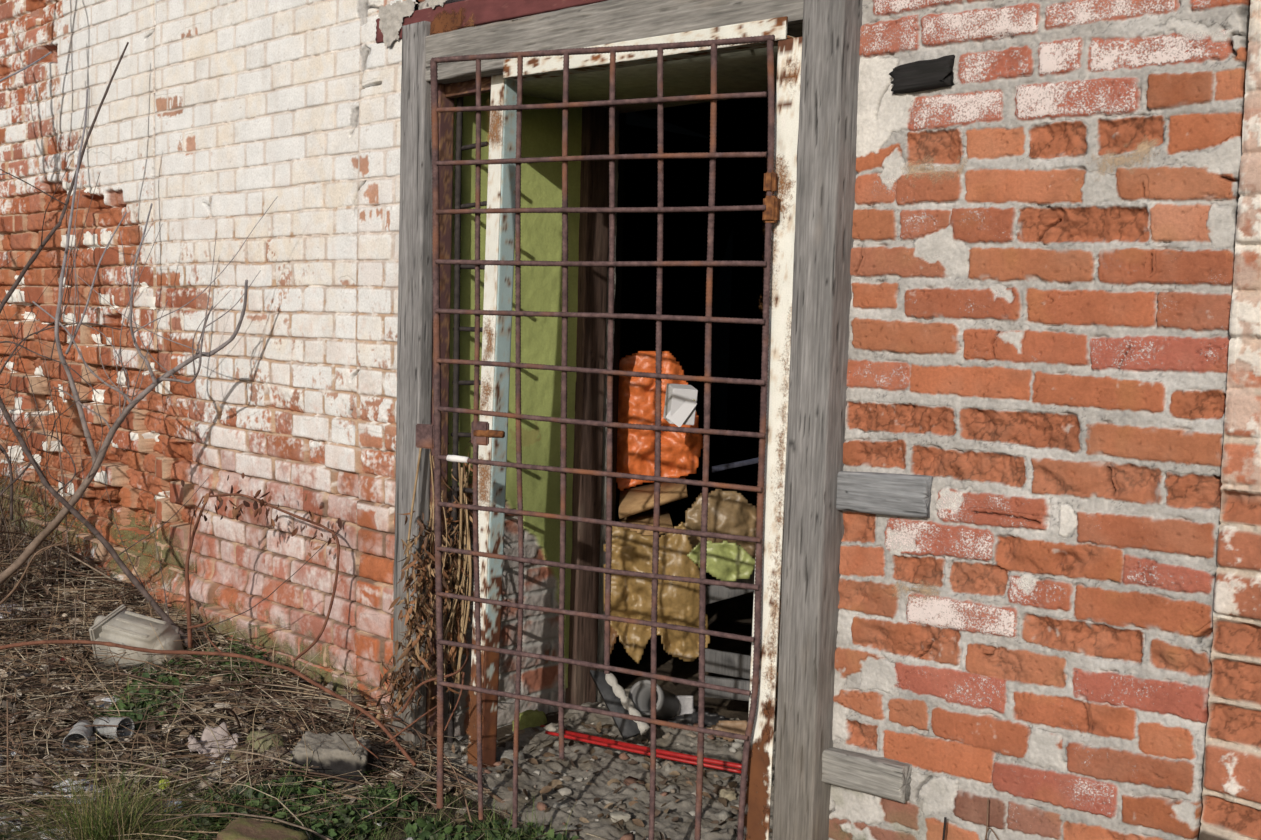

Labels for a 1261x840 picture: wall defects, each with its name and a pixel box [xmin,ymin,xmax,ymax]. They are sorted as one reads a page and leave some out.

crack [349,0,384,138]
corrosion [487,101,502,145]
spalling [905,126,965,168]
spalling [1027,114,1169,161]
crack [351,176,370,217]
spalling [1016,204,1152,246]
spalling [0,0,396,695]
corrosion [483,324,496,361]
crack [1115,342,1135,374]
crack [347,366,361,431]
corrosion [777,337,791,525]
corrosion [744,581,779,840]